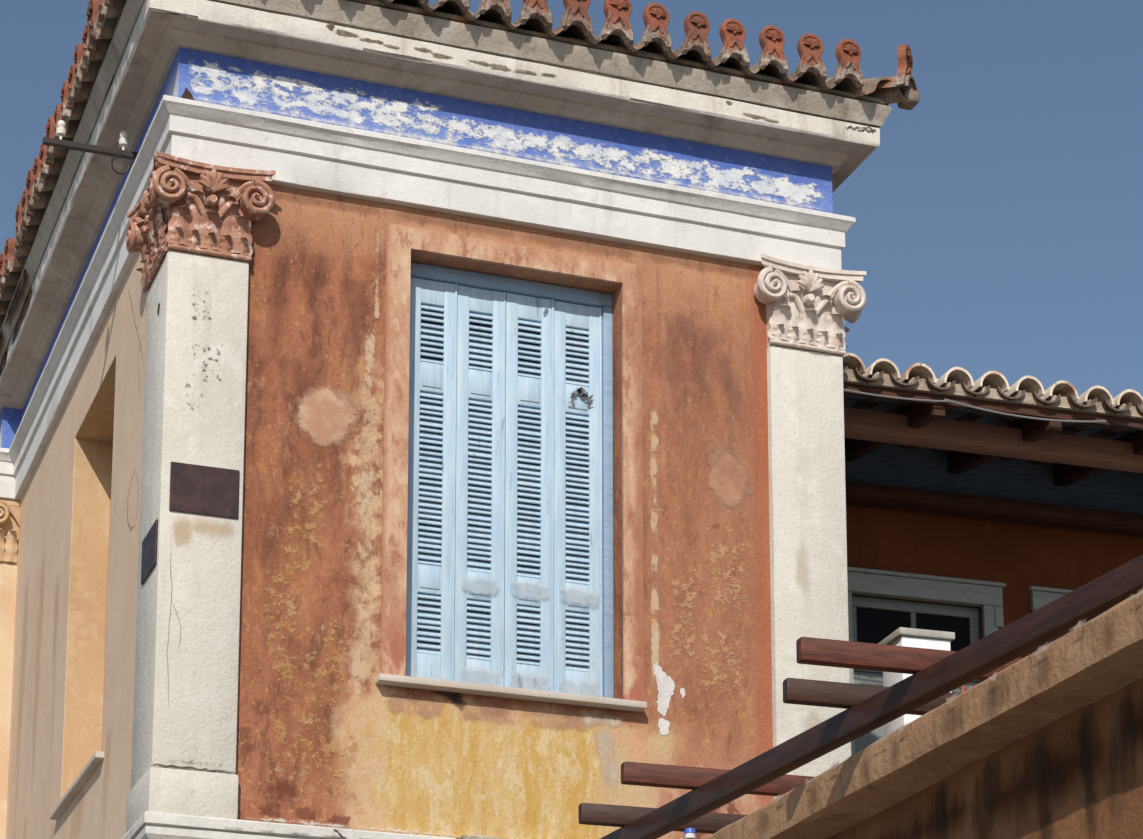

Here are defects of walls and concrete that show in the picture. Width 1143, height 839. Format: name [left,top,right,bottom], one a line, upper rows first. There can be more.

peeling [182,59,824,209]
peeling [650,409,659,540]
peeling [707,542,747,611]
damp [435,691,464,707]
damp [552,715,621,788]
peeling [650,555,742,735]
damp [891,731,1101,839]